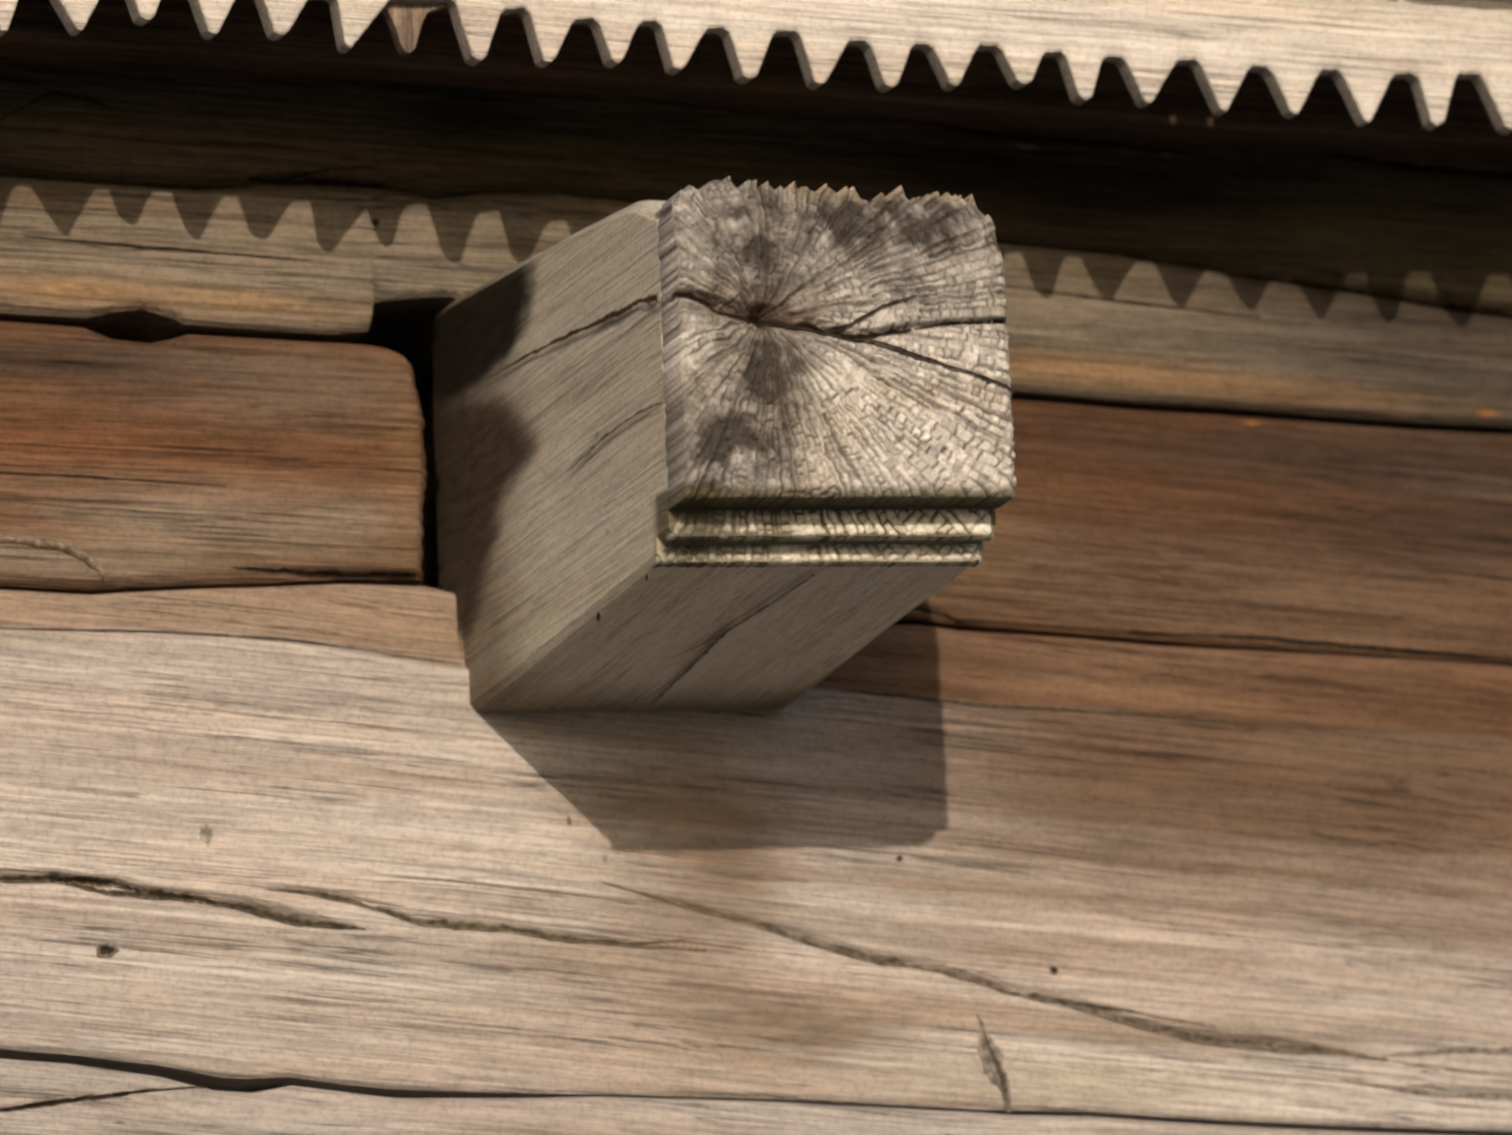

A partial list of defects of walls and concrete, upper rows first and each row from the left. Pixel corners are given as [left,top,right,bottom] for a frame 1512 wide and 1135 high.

crack [487,285,1261,393]
crack [650,574,815,704]
crack [0,871,1512,1099]
crack [0,1086,209,1111]